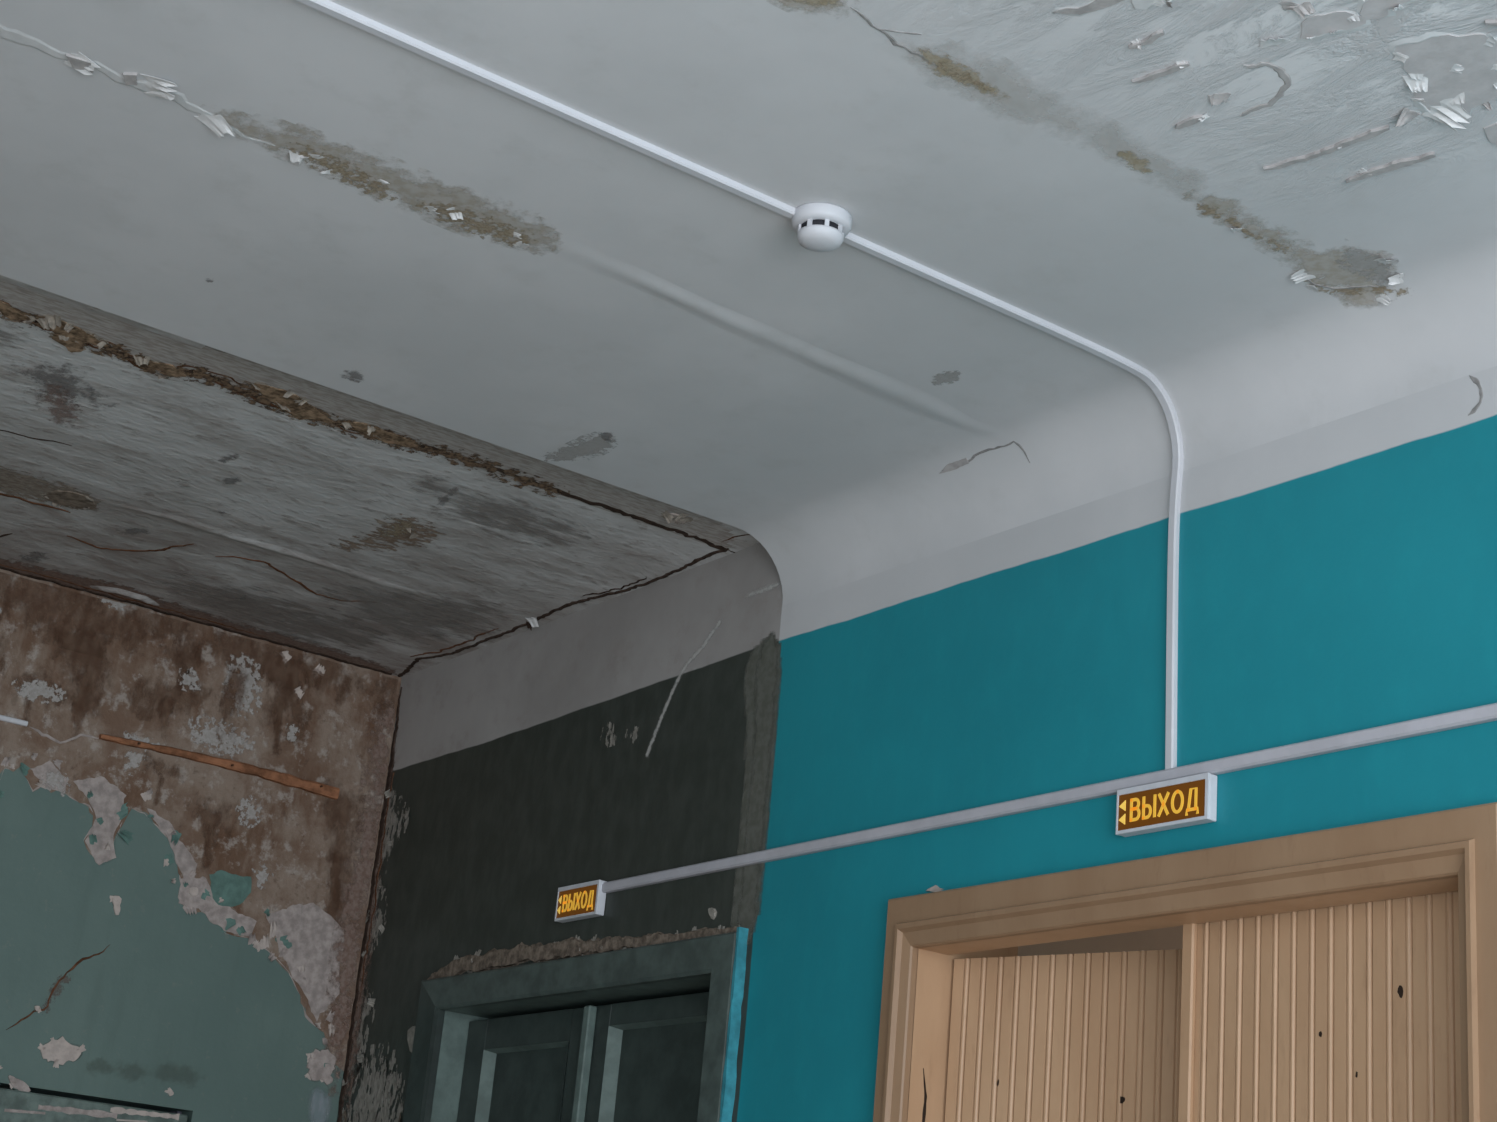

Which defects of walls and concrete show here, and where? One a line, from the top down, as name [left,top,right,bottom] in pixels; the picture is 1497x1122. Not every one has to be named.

peeling [0,24,275,146]
crack [850,7,938,67]
leakage [919,50,1006,97]
peeling [1052,0,1175,17]
peeling [1263,32,1497,171]
leakage [223,112,558,251]
leakage [1185,195,1407,306]
leakage [416,478,588,547]
leakage [164,571,502,649]
crack [0,299,750,1122]
peeling [0,569,416,1122]
spalling [427,907,740,980]